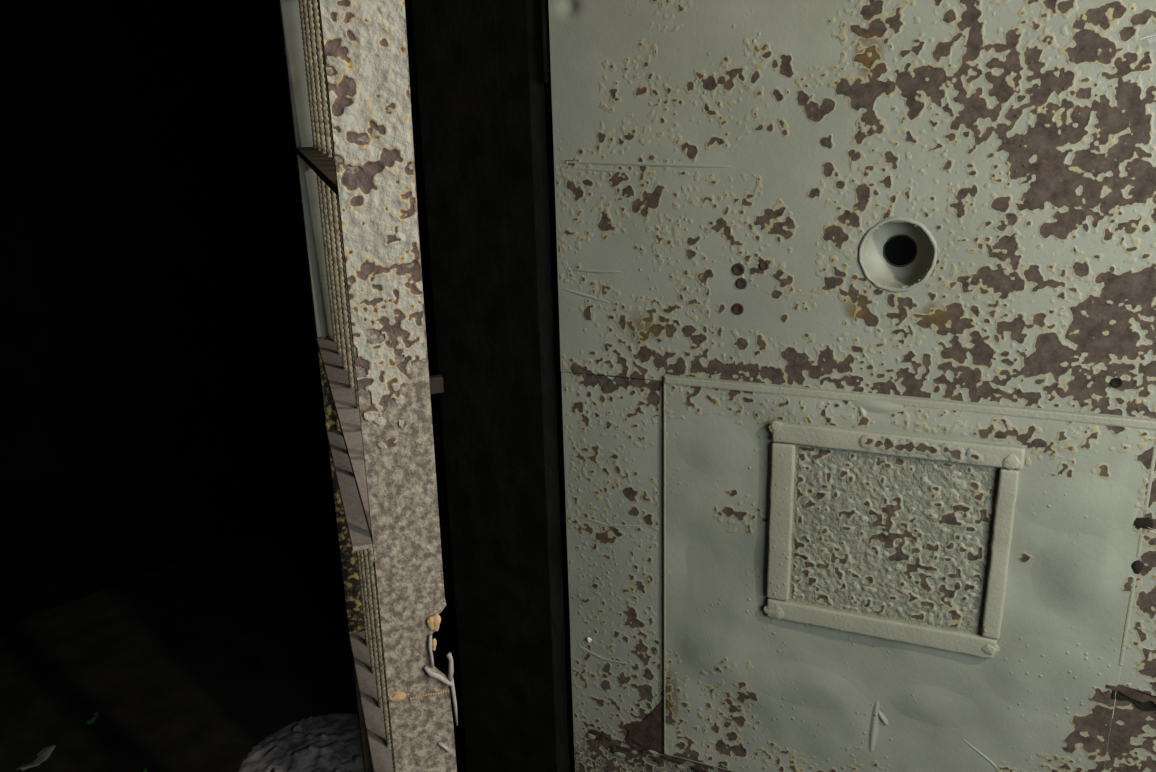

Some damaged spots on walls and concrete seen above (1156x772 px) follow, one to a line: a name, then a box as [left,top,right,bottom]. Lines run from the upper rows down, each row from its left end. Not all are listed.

peeling [320,0,426,449]
peeling [556,0,1156,425]
peeling [900,269,1129,479]
peeling [567,466,670,652]
peeling [713,489,768,535]
peeling [793,447,994,630]
peeling [1018,551,1033,563]
peeling [576,743,627,772]
spalling [1112,690,1156,727]
peeling [1132,749,1156,772]